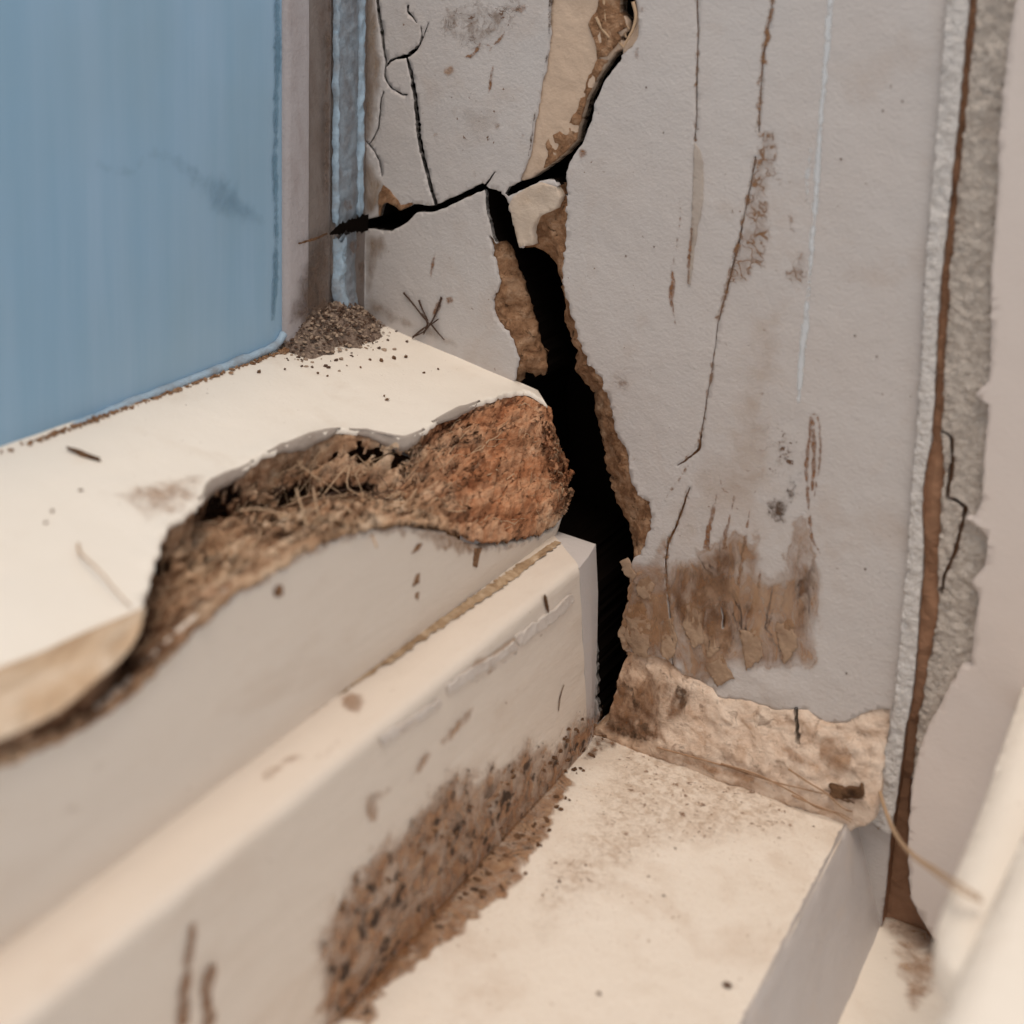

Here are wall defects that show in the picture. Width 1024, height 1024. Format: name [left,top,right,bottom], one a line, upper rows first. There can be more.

corrosion [757,0,775,83]
corrosion [715,97,775,318]
peeling [267,400,480,454]
crack [298,0,638,722]
spalling [491,0,891,831]
crack [665,0,773,666]
corrosion [804,414,821,550]
crack [941,430,968,595]
peeling [911,0,1017,779]
peeling [0,607,145,739]
leakage [318,718,598,1024]
leakage [603,751,794,843]